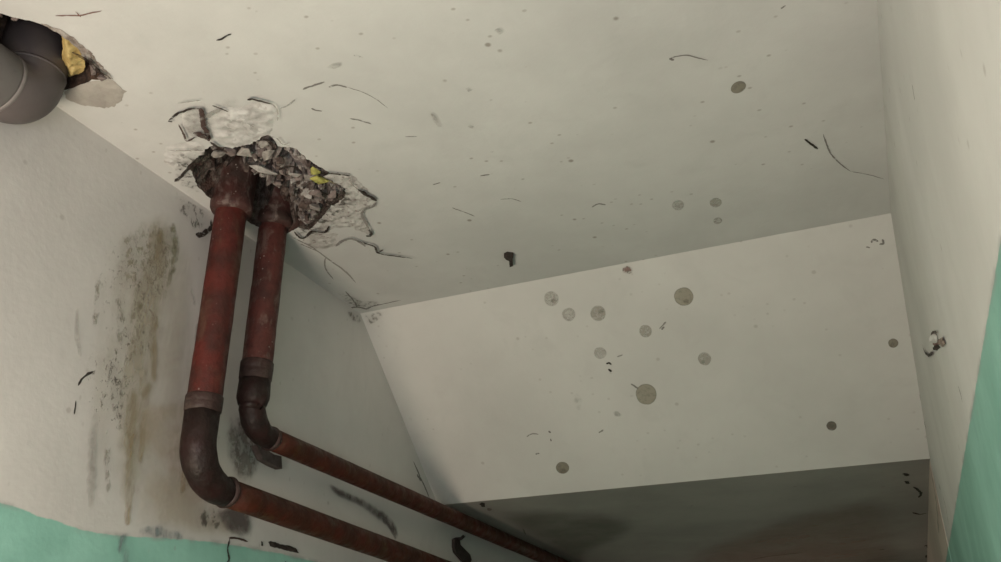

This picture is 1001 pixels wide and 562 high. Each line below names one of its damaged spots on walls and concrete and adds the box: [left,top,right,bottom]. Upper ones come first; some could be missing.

spalling [0,13,19,41]
spalling [42,24,127,108]
spalling [164,98,408,258]
spalling [923,331,945,357]
water stain [93,315,157,464]